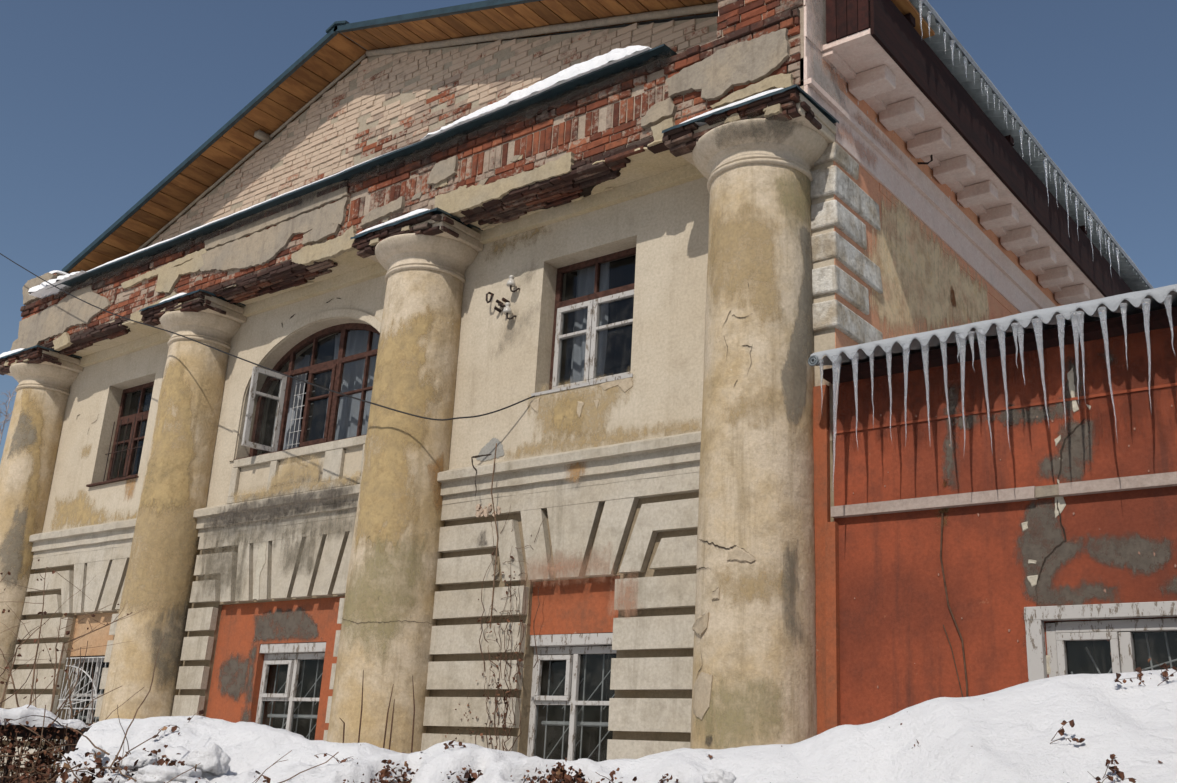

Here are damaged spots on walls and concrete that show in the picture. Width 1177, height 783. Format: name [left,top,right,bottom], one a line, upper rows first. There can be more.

spalling [0,8,822,375]